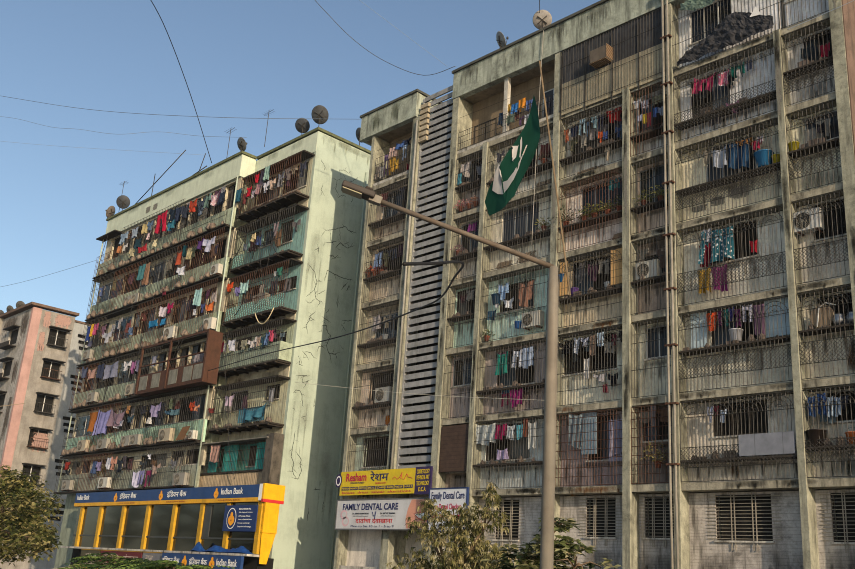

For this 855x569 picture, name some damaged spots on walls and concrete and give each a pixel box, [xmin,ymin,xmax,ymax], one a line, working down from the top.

crack [290,224,355,520]